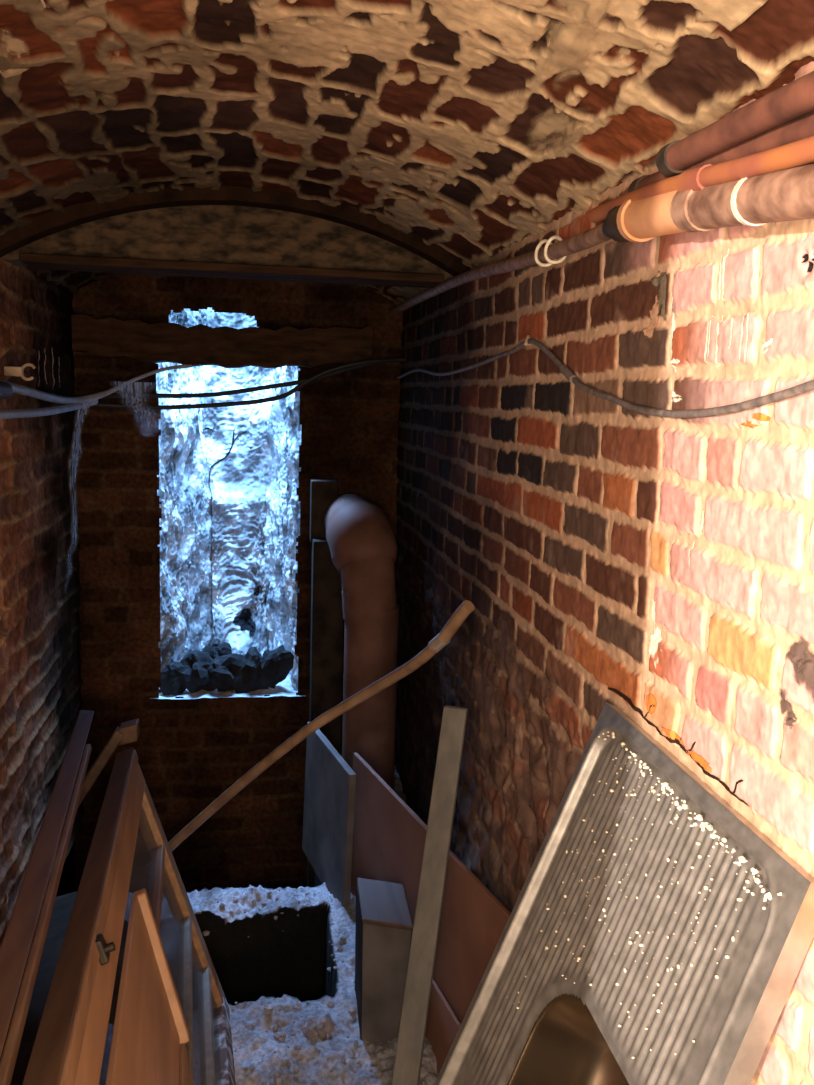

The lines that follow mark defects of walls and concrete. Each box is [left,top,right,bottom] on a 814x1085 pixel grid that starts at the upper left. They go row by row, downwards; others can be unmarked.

peeling [0,30,30,78]
peeling [549,0,610,78]
peeling [531,109,582,151]
crack [608,688,748,806]